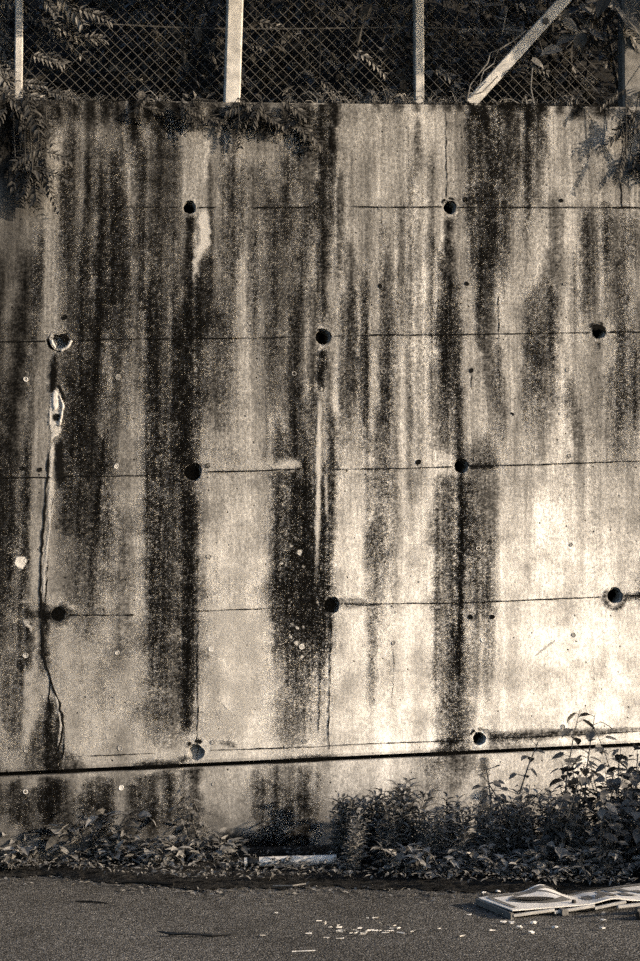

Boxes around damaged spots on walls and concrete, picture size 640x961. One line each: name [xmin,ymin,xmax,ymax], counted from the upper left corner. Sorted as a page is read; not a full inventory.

crack [39,452,65,762]
peeling [49,388,64,439]
leakage [0,102,548,852]
leakage [522,196,640,459]